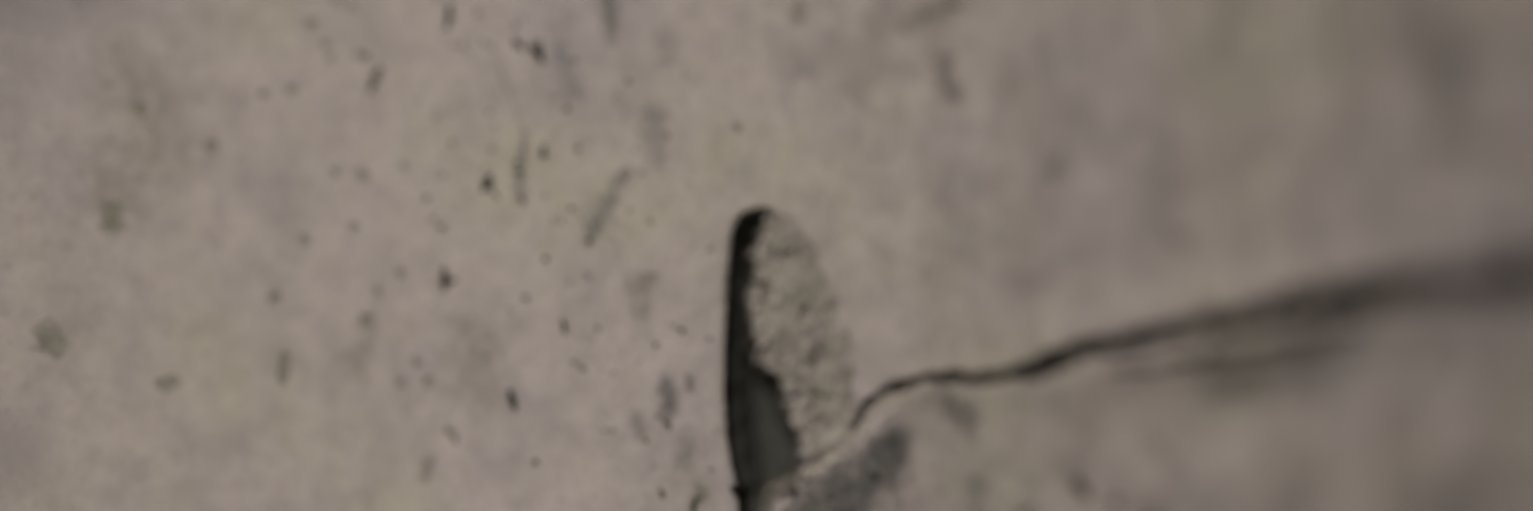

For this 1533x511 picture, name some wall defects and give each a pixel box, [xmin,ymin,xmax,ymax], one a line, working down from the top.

spalling [748,217,857,490]
crack [725,210,1533,511]